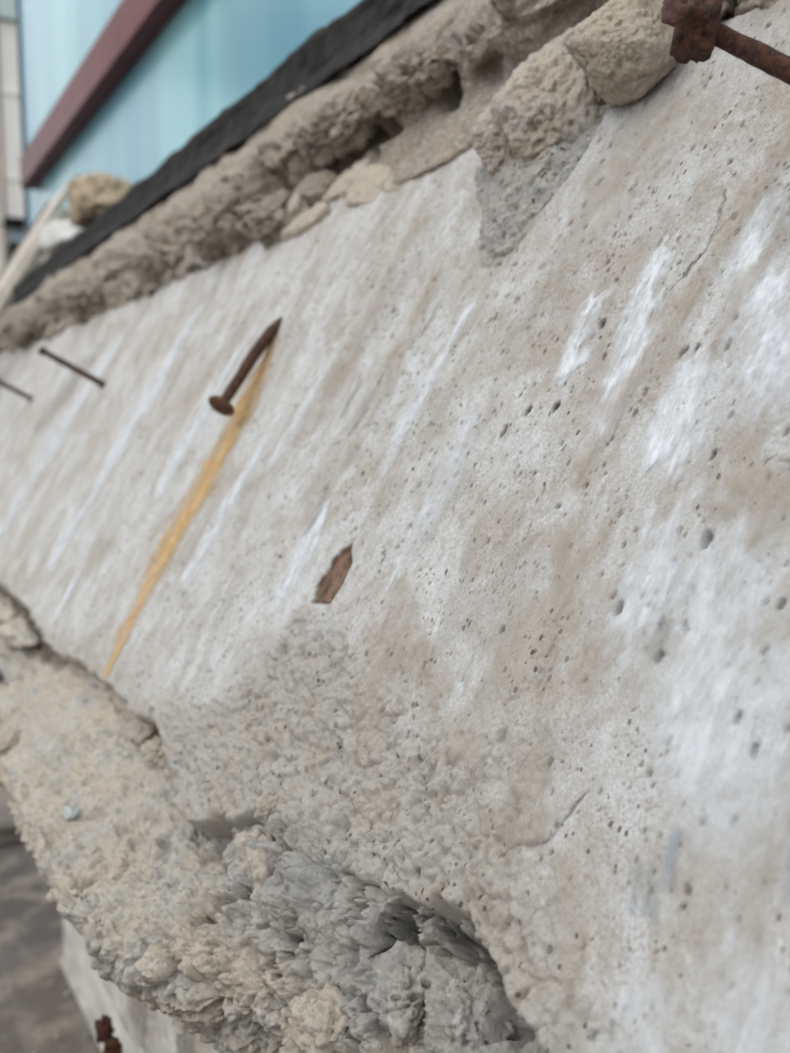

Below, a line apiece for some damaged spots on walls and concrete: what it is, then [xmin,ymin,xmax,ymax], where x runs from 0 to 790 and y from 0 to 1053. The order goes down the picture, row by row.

spalling [0,0,609,354]
rust [661,0,691,27]
spalling [720,0,779,21]
rust [105,340,274,676]
rust [312,543,353,603]
spalling [0,588,546,1053]